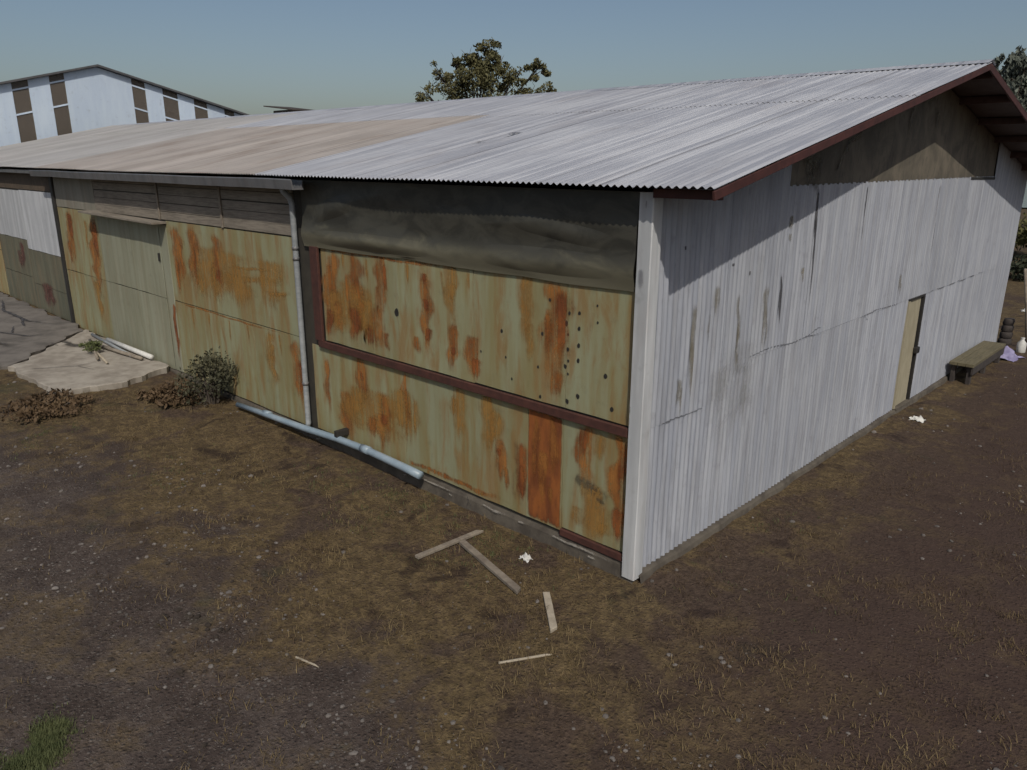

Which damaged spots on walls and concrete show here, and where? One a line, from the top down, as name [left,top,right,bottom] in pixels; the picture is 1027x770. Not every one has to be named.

rust [66,213,104,314]
rust [170,229,263,294]
rust [267,334,303,398]
rust [325,358,367,429]
rust [323,250,480,377]
rust [520,277,574,393]
rust [483,396,562,527]
rust [575,427,628,539]